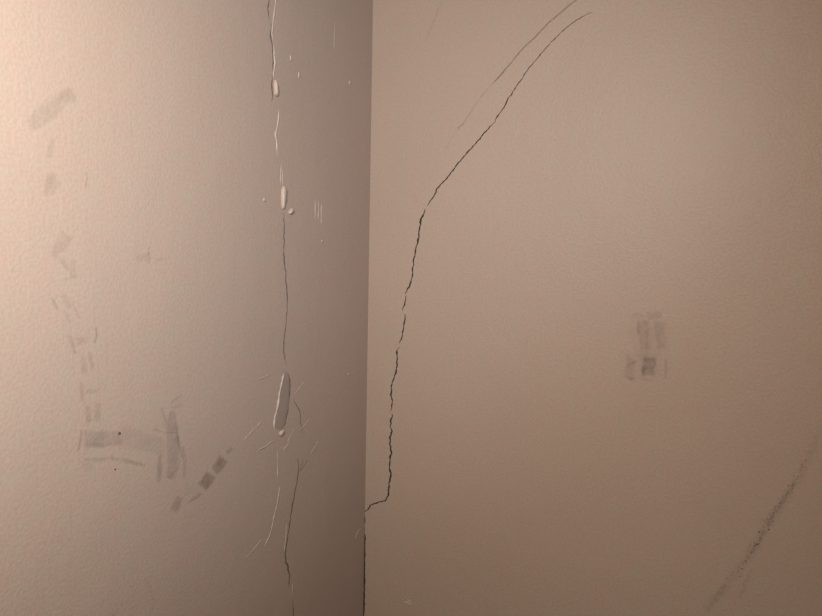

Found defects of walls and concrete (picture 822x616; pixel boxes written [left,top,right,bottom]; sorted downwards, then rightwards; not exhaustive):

crack [267,0,283,185]
peeling [275,371,290,430]
crack [273,218,302,436]
crack [365,13,589,512]
crack [284,458,306,615]
crack [360,535,368,616]